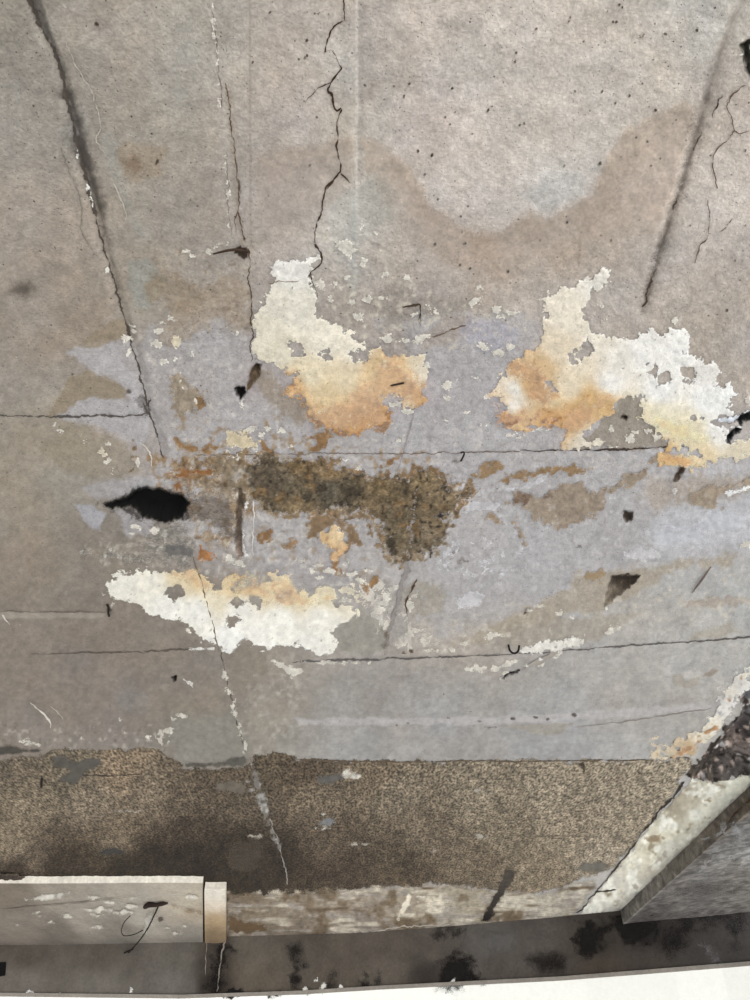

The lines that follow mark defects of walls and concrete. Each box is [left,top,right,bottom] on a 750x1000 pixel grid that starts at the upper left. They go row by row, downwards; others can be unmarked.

crack [0,0,164,457]
crack [225,0,350,361]
damp [363,104,693,252]
peeling [97,486,469,679]
damp [80,447,526,585]
rust [300,403,359,452]
peeling [234,254,431,437]
efflorescence [452,591,485,609]
crack [280,446,687,455]
rust [495,359,560,431]
peeling [476,266,750,495]
spalling [0,690,750,975]